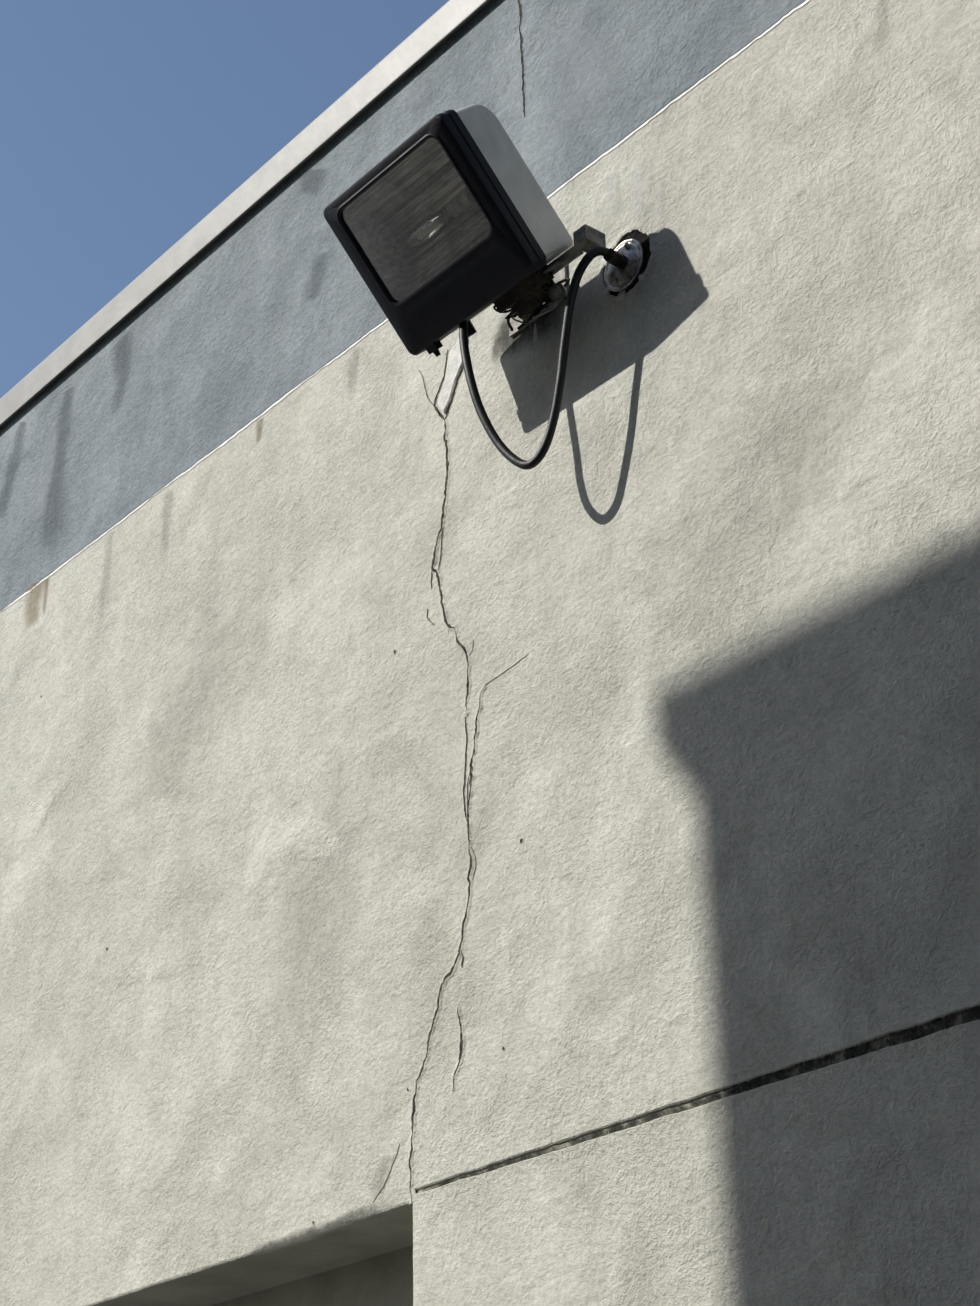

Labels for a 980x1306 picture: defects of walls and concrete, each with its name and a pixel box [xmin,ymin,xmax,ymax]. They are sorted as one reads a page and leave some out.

crack [516,0,527,117]
crack [373,338,529,1204]